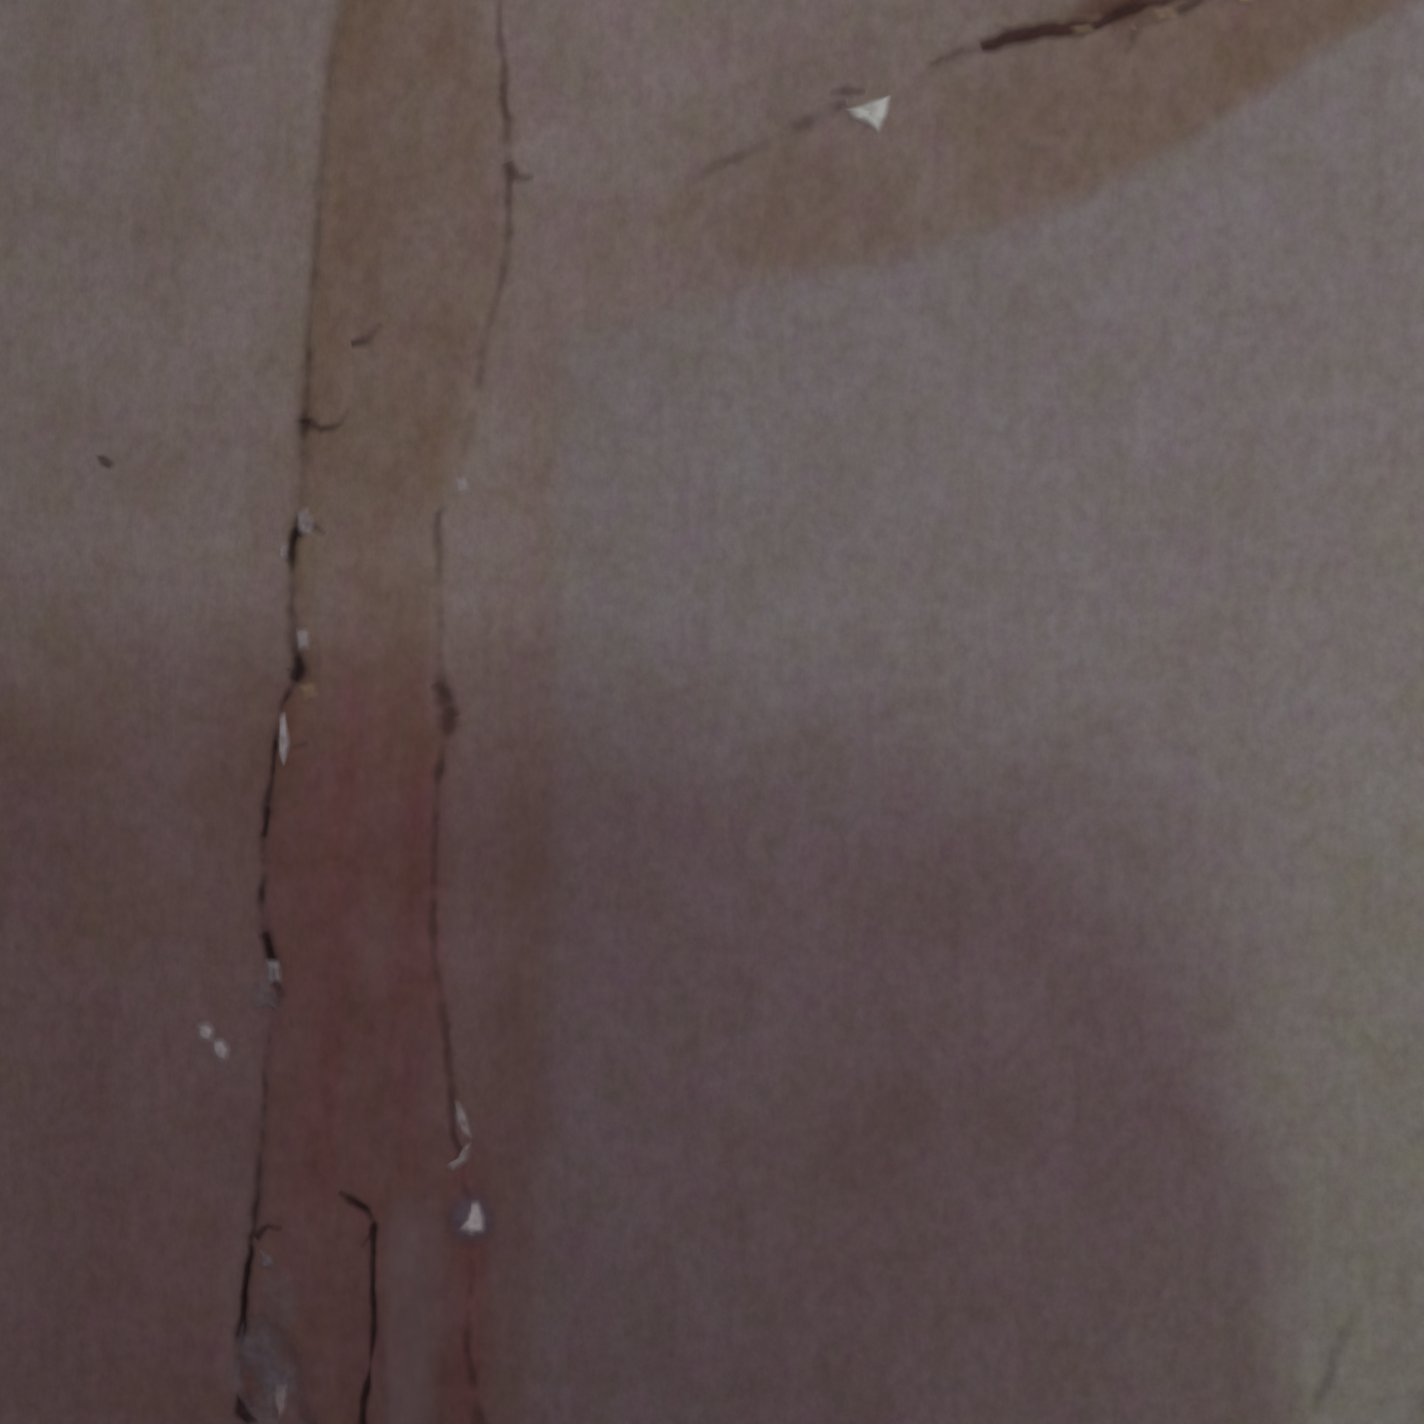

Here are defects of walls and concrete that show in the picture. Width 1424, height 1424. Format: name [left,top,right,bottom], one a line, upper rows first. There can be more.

crack [982,3,1147,49]
spalling [850,97,889,129]
crack [280,516,306,561]
crack [292,655,305,681]
crack [272,716,287,772]
crack [437,688,454,779]
crack [262,806,270,836]
crack [262,933,277,976]
crack [445,1021,460,1148]
crack [237,1233,272,1337]
crack [347,1196,377,1424]